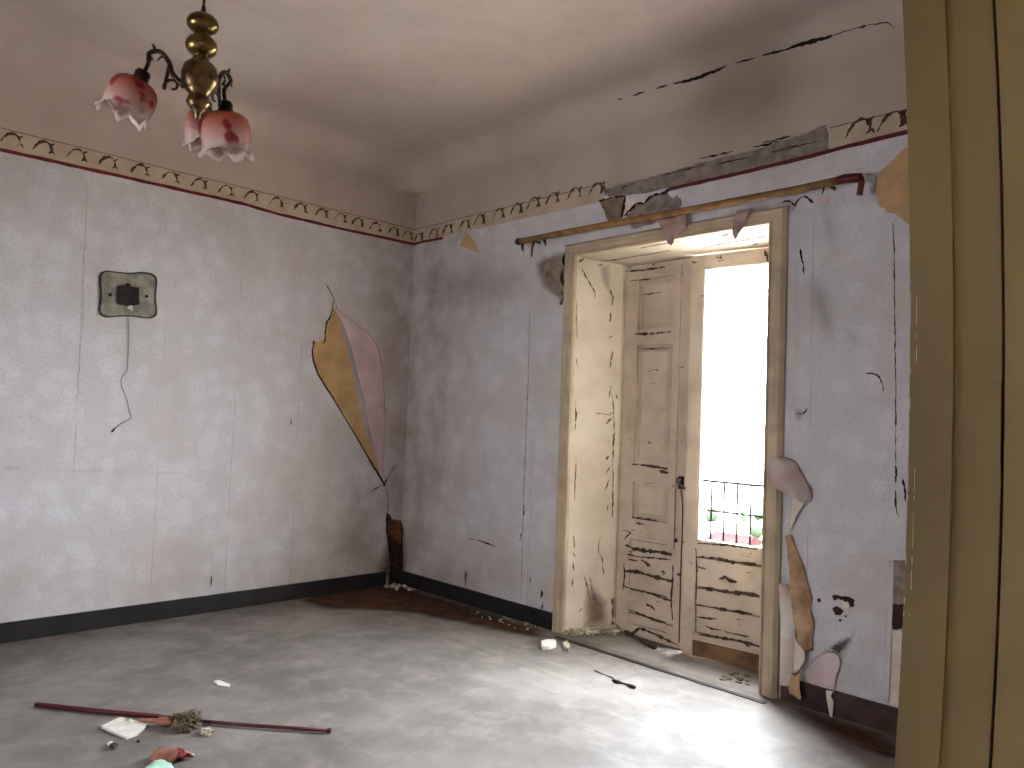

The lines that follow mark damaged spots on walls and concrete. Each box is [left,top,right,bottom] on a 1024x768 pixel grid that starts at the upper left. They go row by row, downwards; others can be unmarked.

crack [619,22,895,100]
spalling [662,136,818,176]
peeling [875,147,909,225]
peeling [460,231,480,252]
flaking render [313,307,380,475]
peeling [631,463,669,485]
spalling [382,513,404,585]
peeling [623,530,679,646]
peeling [695,543,761,647]
flaking render [817,595,855,622]